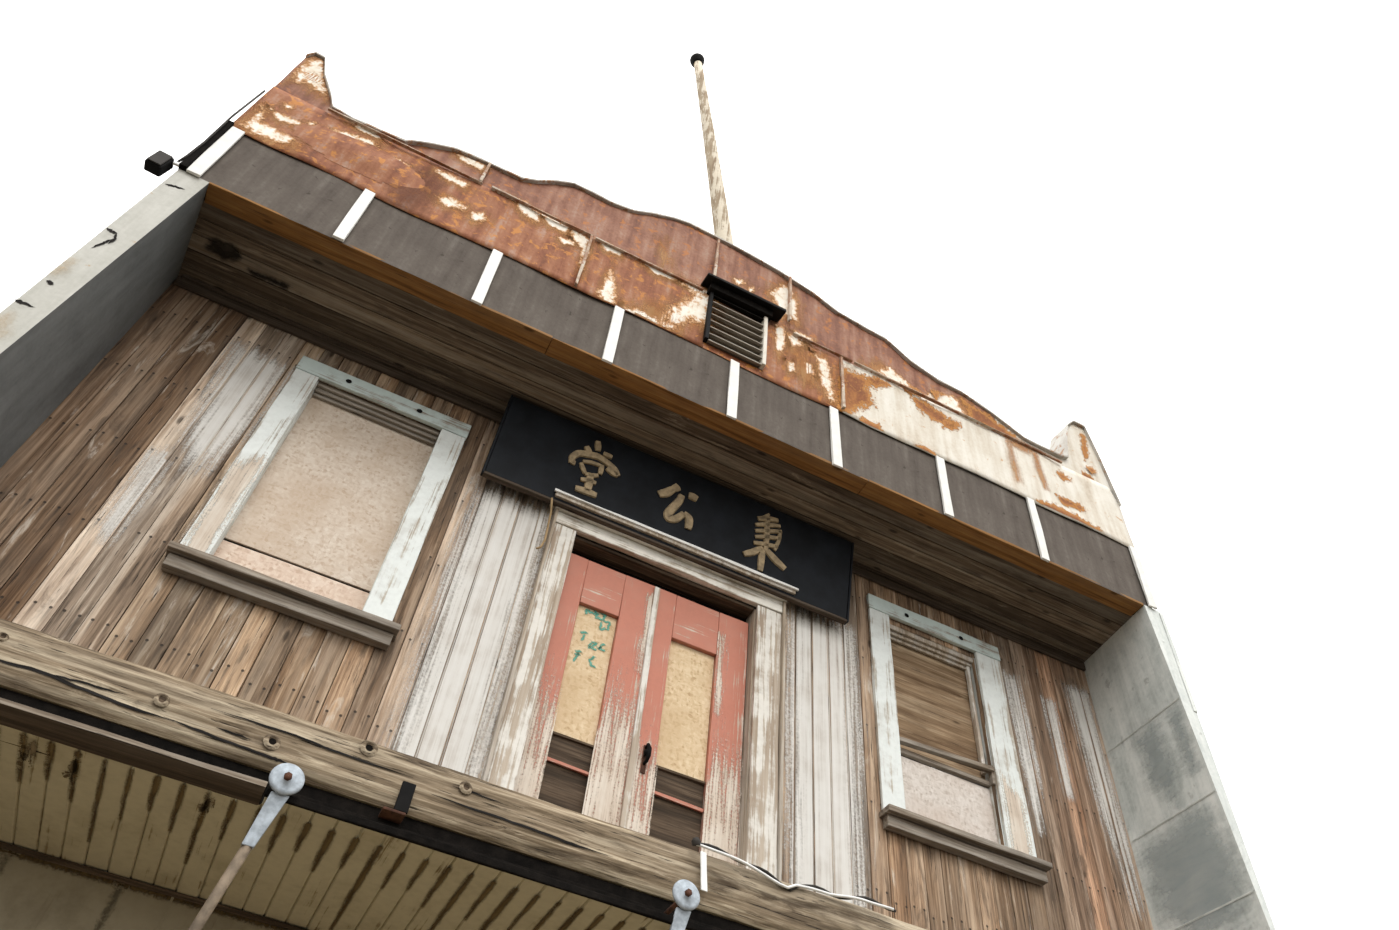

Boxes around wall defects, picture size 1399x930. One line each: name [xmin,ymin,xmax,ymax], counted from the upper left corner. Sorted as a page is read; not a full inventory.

crack [15,280,53,307]
crack [92,228,117,248]
rust [396,172,441,205]
peeling [512,198,719,334]
rust [632,302,668,327]
peeling [732,277,838,407]
rust [834,364,1102,531]
peeling [582,593,658,835]
peeling [785,608,866,907]
damp [311,830,383,930]
damp [381,853,646,930]
damp [1145,818,1240,930]